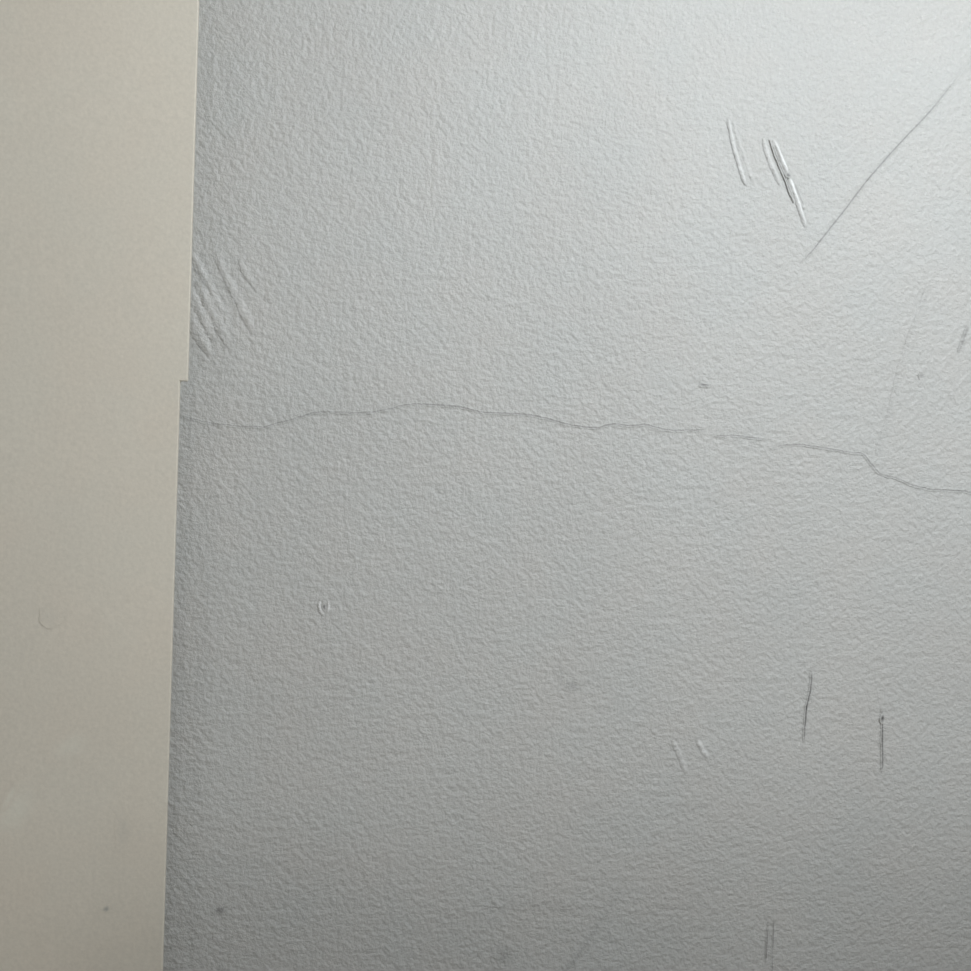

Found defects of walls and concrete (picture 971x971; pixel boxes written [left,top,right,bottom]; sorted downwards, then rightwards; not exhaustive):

crack [802,57,971,262]
crack [958,325,970,353]
crack [180,402,971,494]